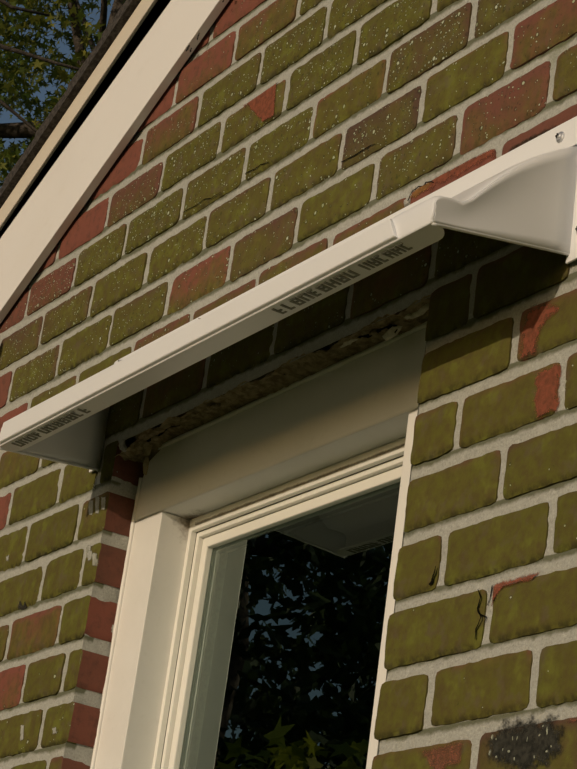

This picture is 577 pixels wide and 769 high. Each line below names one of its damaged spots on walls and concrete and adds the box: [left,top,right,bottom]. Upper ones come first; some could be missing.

spalling [115,295,431,475]
crack [475,586,492,638]
damp [486,715,564,769]